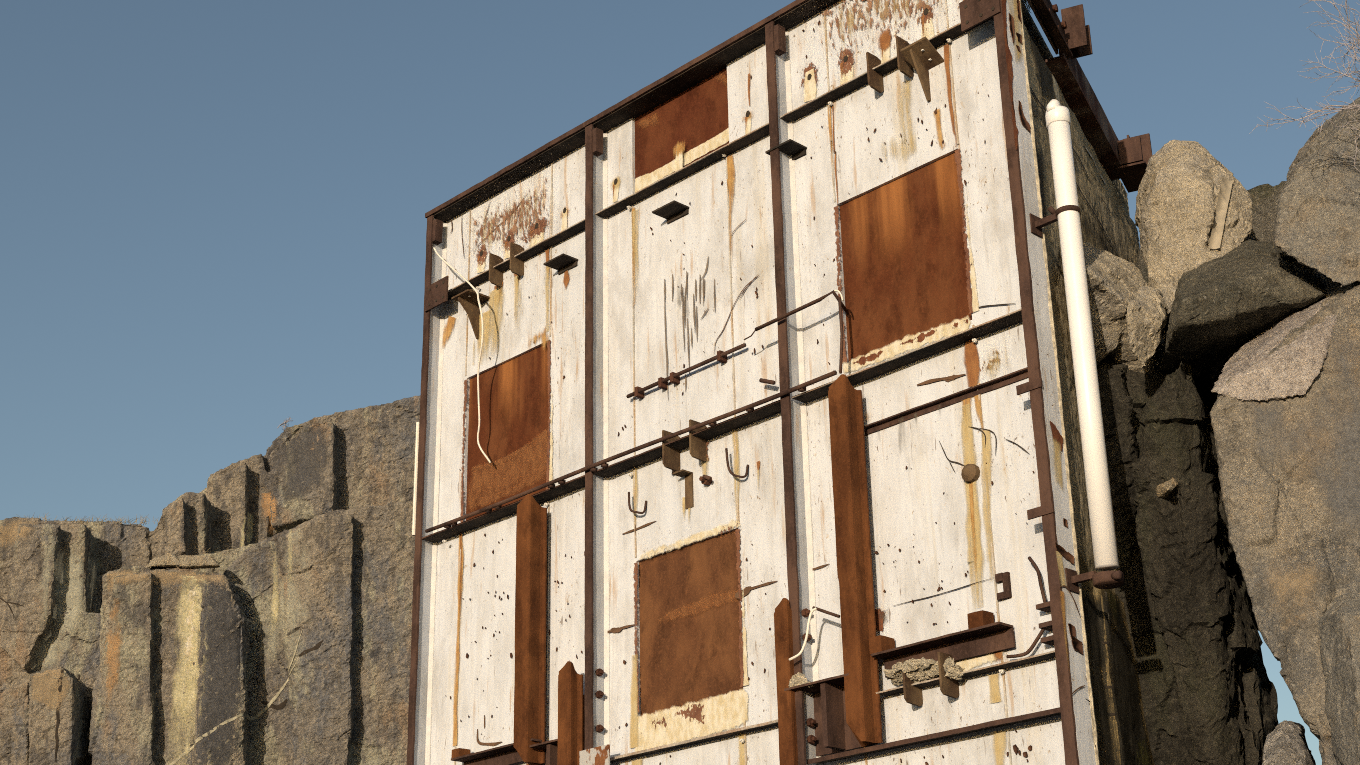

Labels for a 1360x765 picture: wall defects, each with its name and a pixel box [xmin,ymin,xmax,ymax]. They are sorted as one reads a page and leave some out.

rust [879,29,891,64]
rust [639,115,657,127]
rust [673,143,684,172]
rust [443,316,455,345]
rust [475,245,487,273]
rust [473,274,520,352]
rust [503,208,570,347]
rust [469,431,548,508]
rust [961,339,1000,601]
rust [453,533,464,746]
rust [661,591,737,621]
damp [1083,592,1150,765]